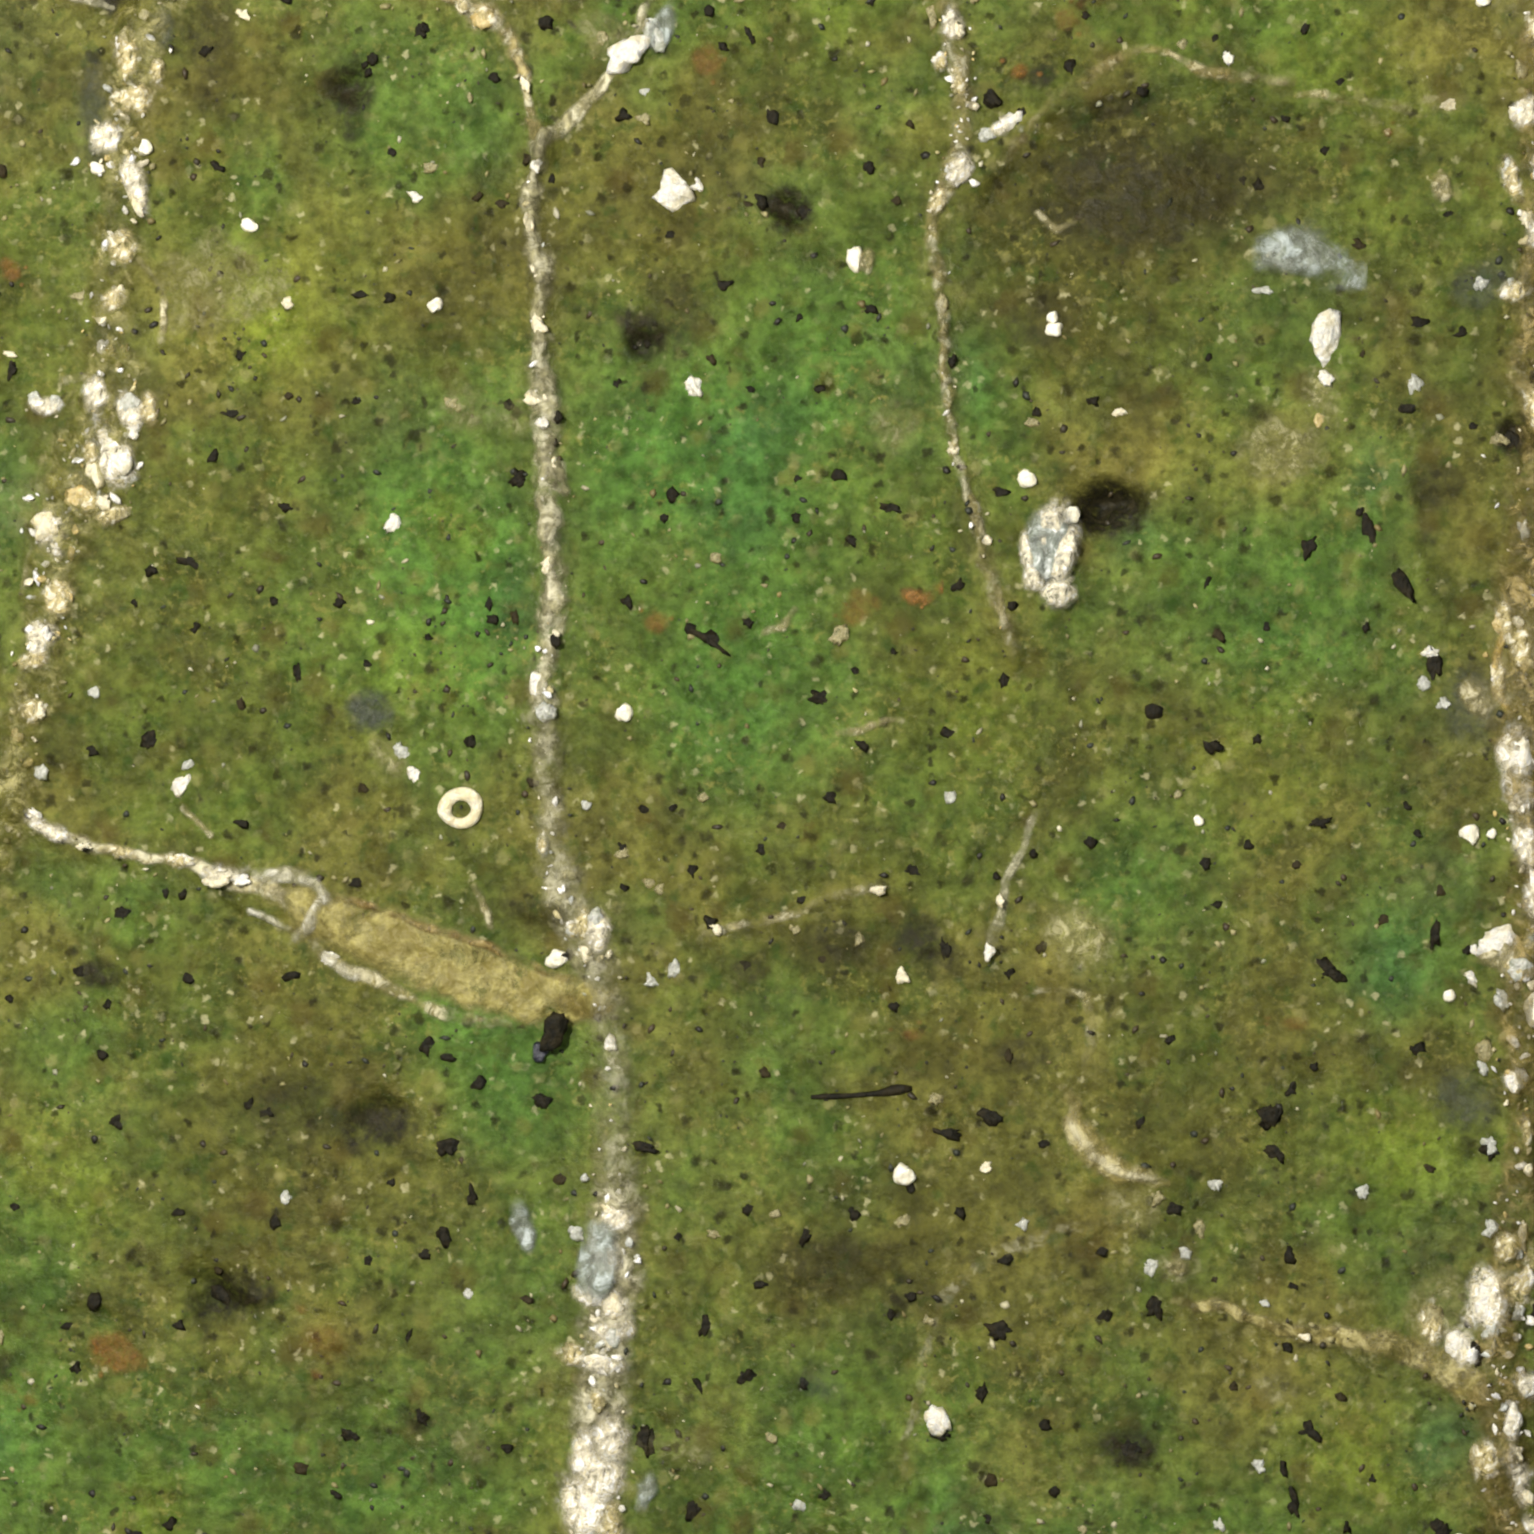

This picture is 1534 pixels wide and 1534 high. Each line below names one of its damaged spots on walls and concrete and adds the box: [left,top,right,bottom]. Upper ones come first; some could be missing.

water stain [1072,479,1148,537]
peeling [288,887,612,1063]